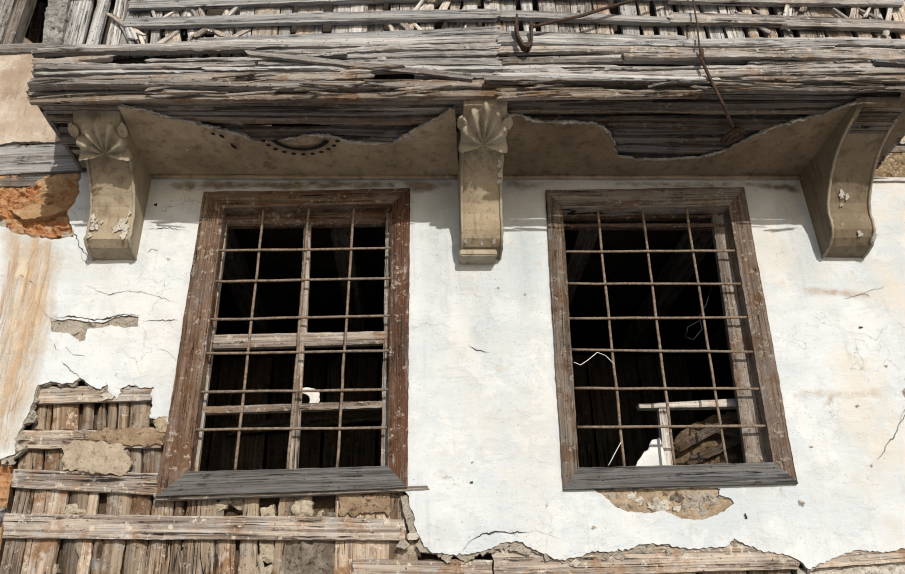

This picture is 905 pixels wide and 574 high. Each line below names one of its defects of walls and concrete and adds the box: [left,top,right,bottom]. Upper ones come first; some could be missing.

spalling [0,182,79,240]
water stain [0,237,54,419]
spalling [51,316,138,342]
flaking render [0,378,139,465]
crack [463,530,565,550]
flaking render [395,495,684,567]
spalling [596,487,733,520]
flaking render [757,550,826,574]